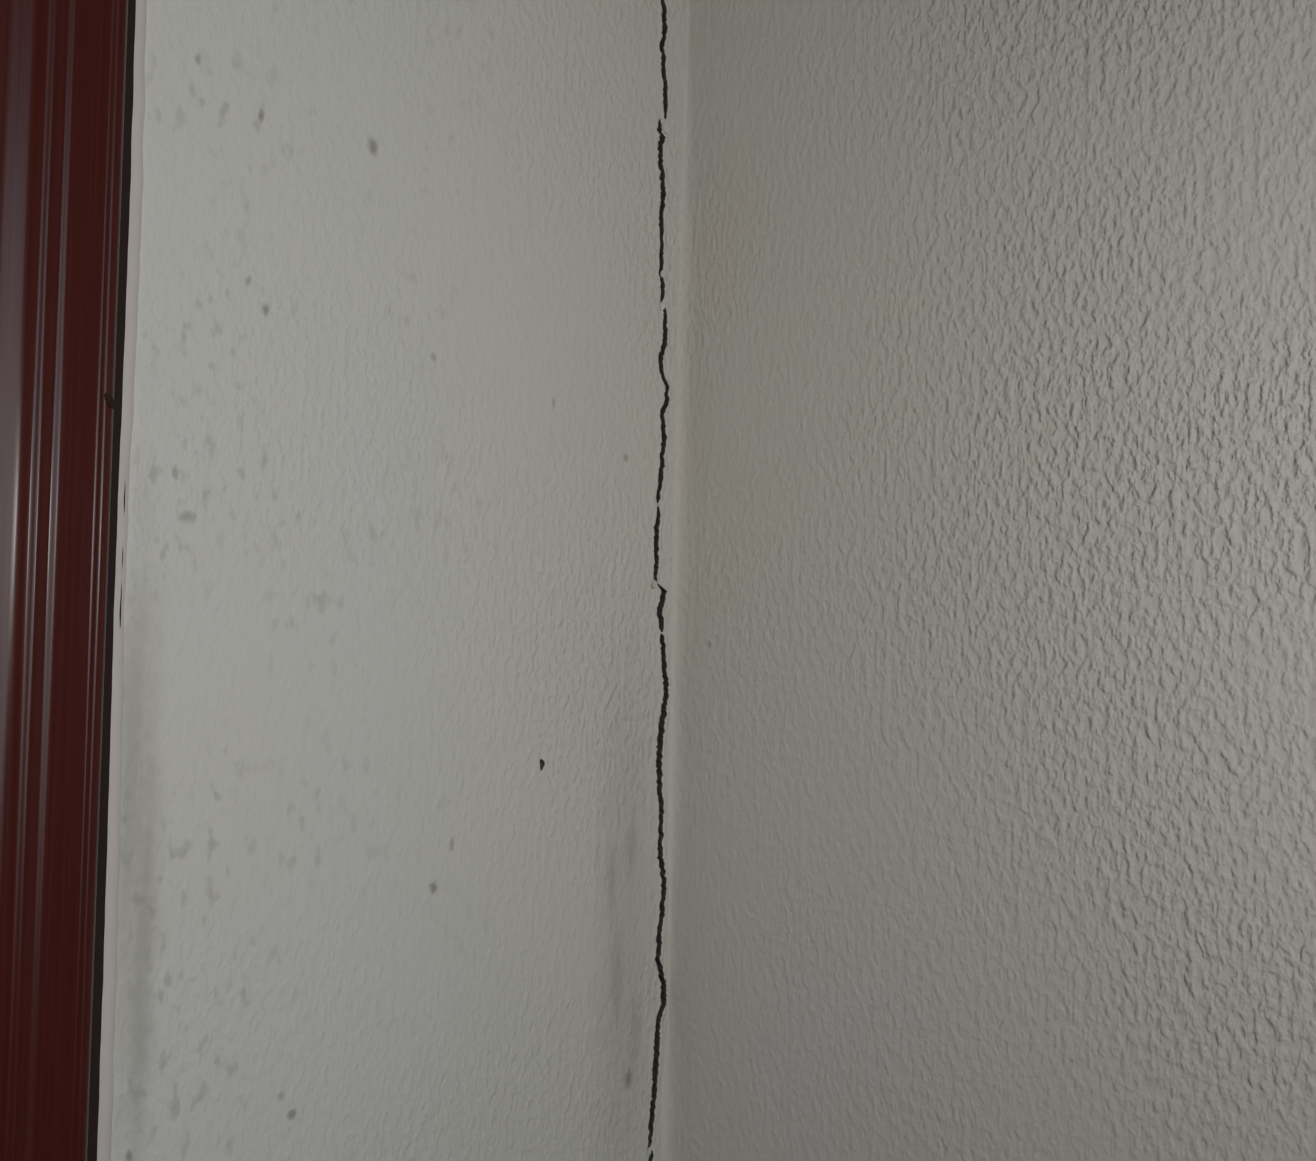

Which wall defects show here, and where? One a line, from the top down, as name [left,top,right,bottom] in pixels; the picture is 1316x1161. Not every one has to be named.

crack [645,0,673,1161]